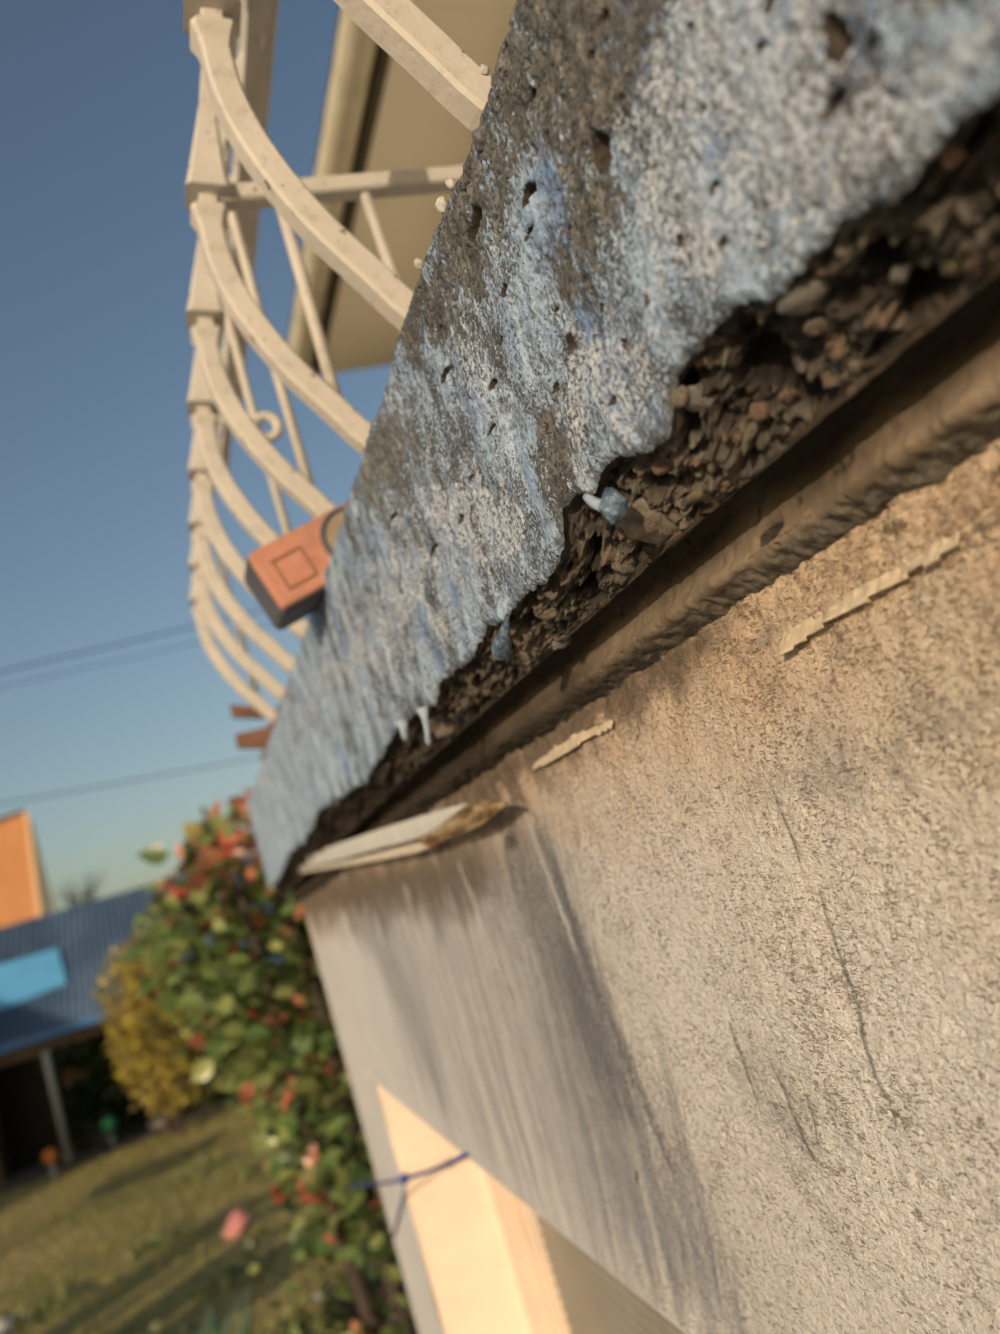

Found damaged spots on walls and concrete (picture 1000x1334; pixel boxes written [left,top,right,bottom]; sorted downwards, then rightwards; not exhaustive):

peeling [394,0,688,373]
spalling [273,94,1000,892]
damp [440,630,707,817]
damp [301,844,488,928]
crack [822,901,902,1119]